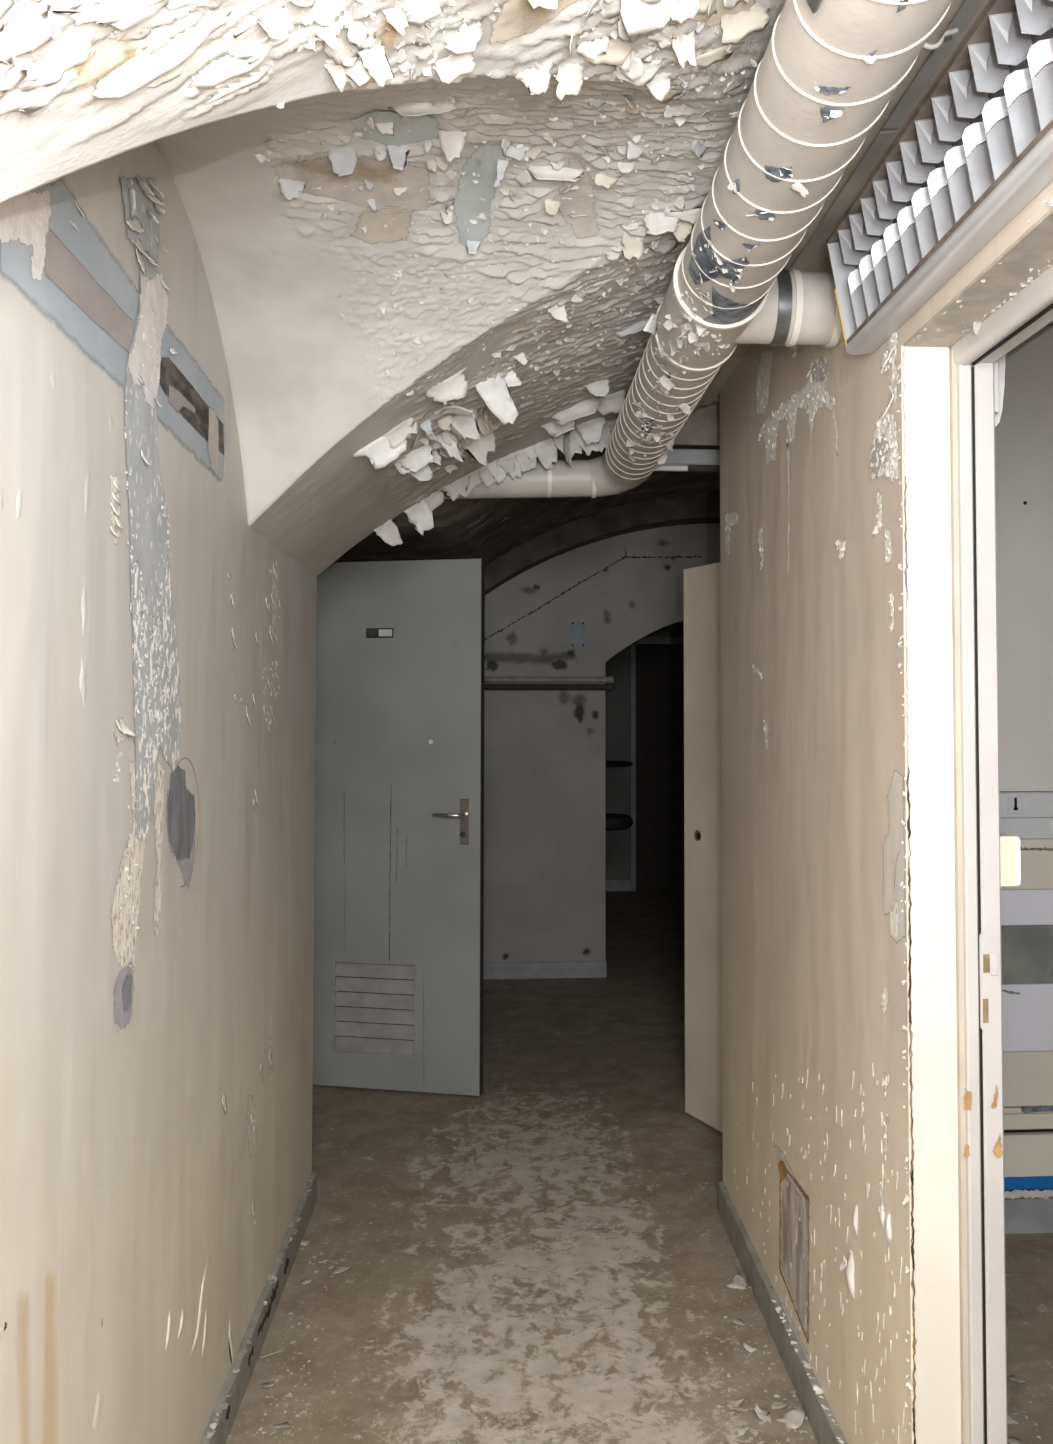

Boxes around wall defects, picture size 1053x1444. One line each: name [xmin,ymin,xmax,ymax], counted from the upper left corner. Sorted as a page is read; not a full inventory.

peeling [765,166,809,198]
peeling [746,210,776,221]
peeling [0,0,771,546]